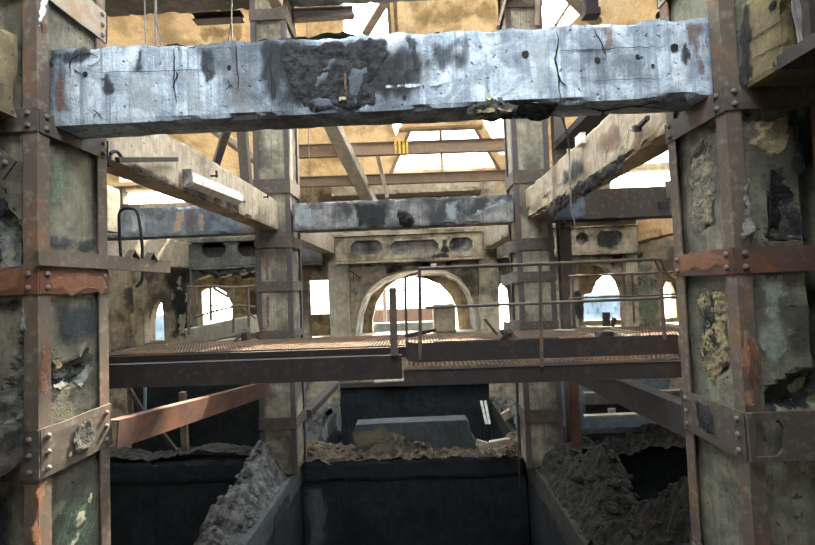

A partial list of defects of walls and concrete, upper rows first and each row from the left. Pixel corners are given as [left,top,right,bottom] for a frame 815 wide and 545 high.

spalling [281,38,388,112]
crack [554,31,664,100]
spalling [465,93,559,122]
crack [584,102,678,152]
spalling [541,154,625,219]
spalling [397,209,415,228]
corrosion [681,249,729,271]
corrosion [50,273,106,295]
spalling [696,289,732,380]
spalling [51,348,93,390]
spalling [764,368,815,412]
corrosion [33,519,42,545]